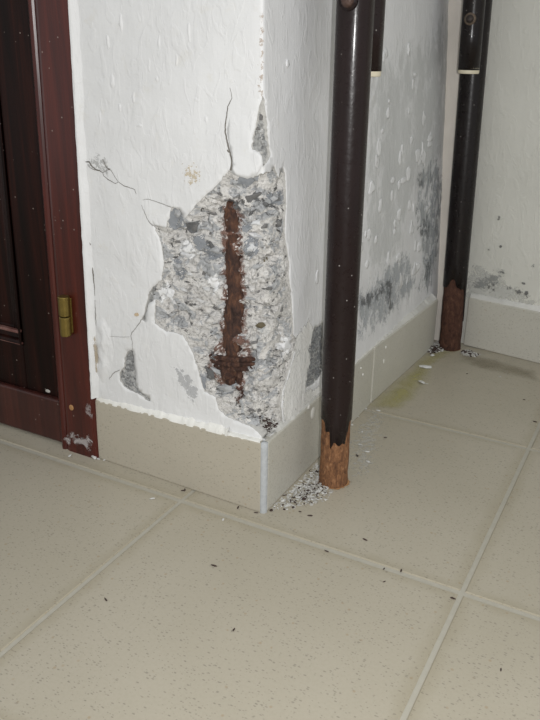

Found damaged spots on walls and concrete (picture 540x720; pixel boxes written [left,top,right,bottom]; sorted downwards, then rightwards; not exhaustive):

crack [224,90,232,171]
flaking render [253,112,268,162]
crack [86,159,171,226]
spalling [143,169,296,433]
rust [220,200,252,357]
damp [358,162,442,334]
damp [466,265,534,305]
flaking render [121,350,150,401]
flaking render [305,325,322,386]